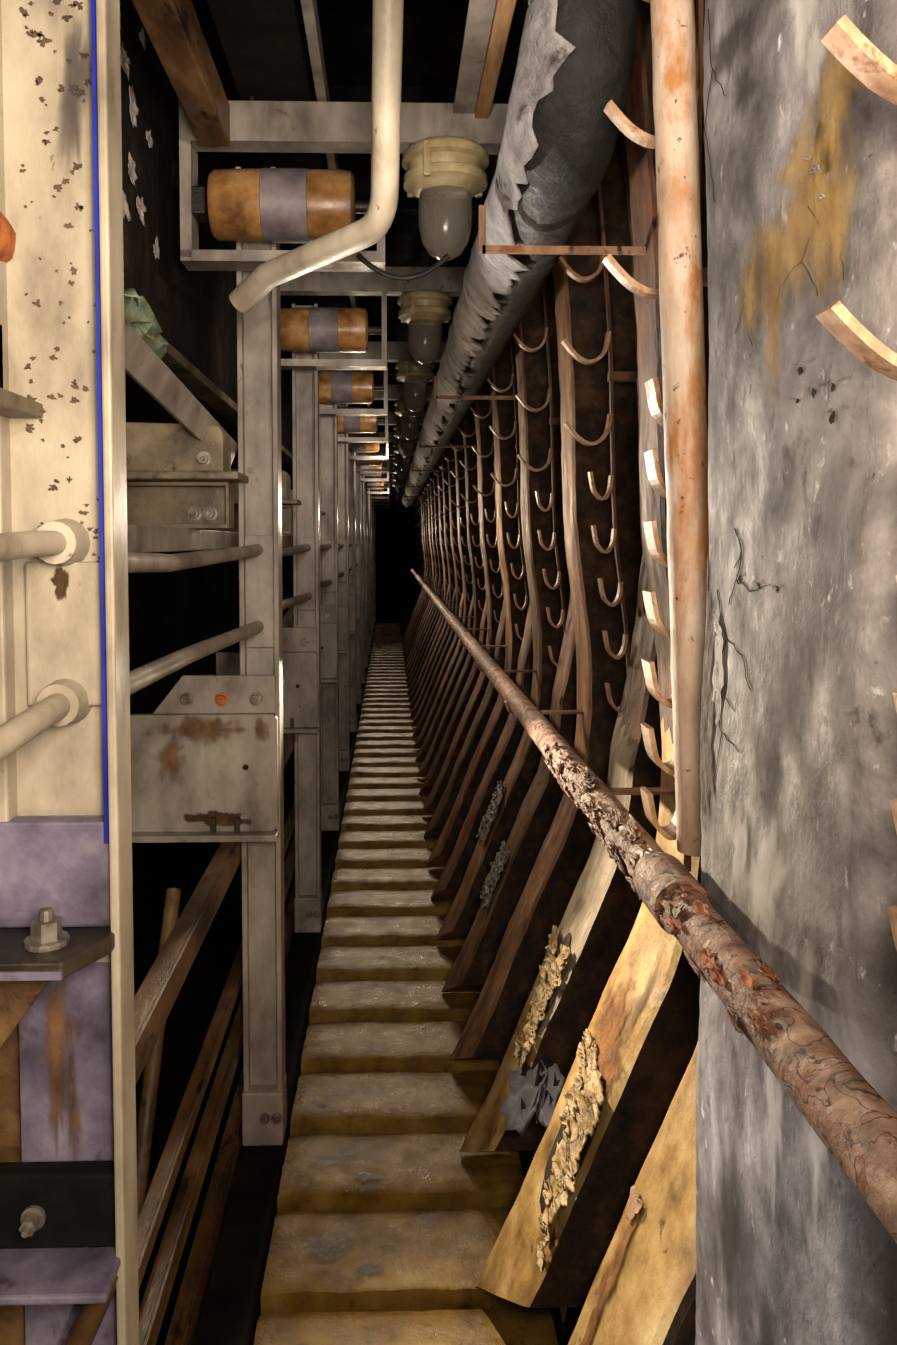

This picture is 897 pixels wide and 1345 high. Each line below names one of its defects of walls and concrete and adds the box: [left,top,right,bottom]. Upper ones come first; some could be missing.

leakage [744,0,854,369]
crack [713,528,770,789]
corrosion [161,719,266,773]
corrosion [184,811,251,826]
peeling [513,925,571,1075]
corrosion [593,976,651,1092]
peeling [536,1029,606,1273]
corrosion [581,1185,645,1345]